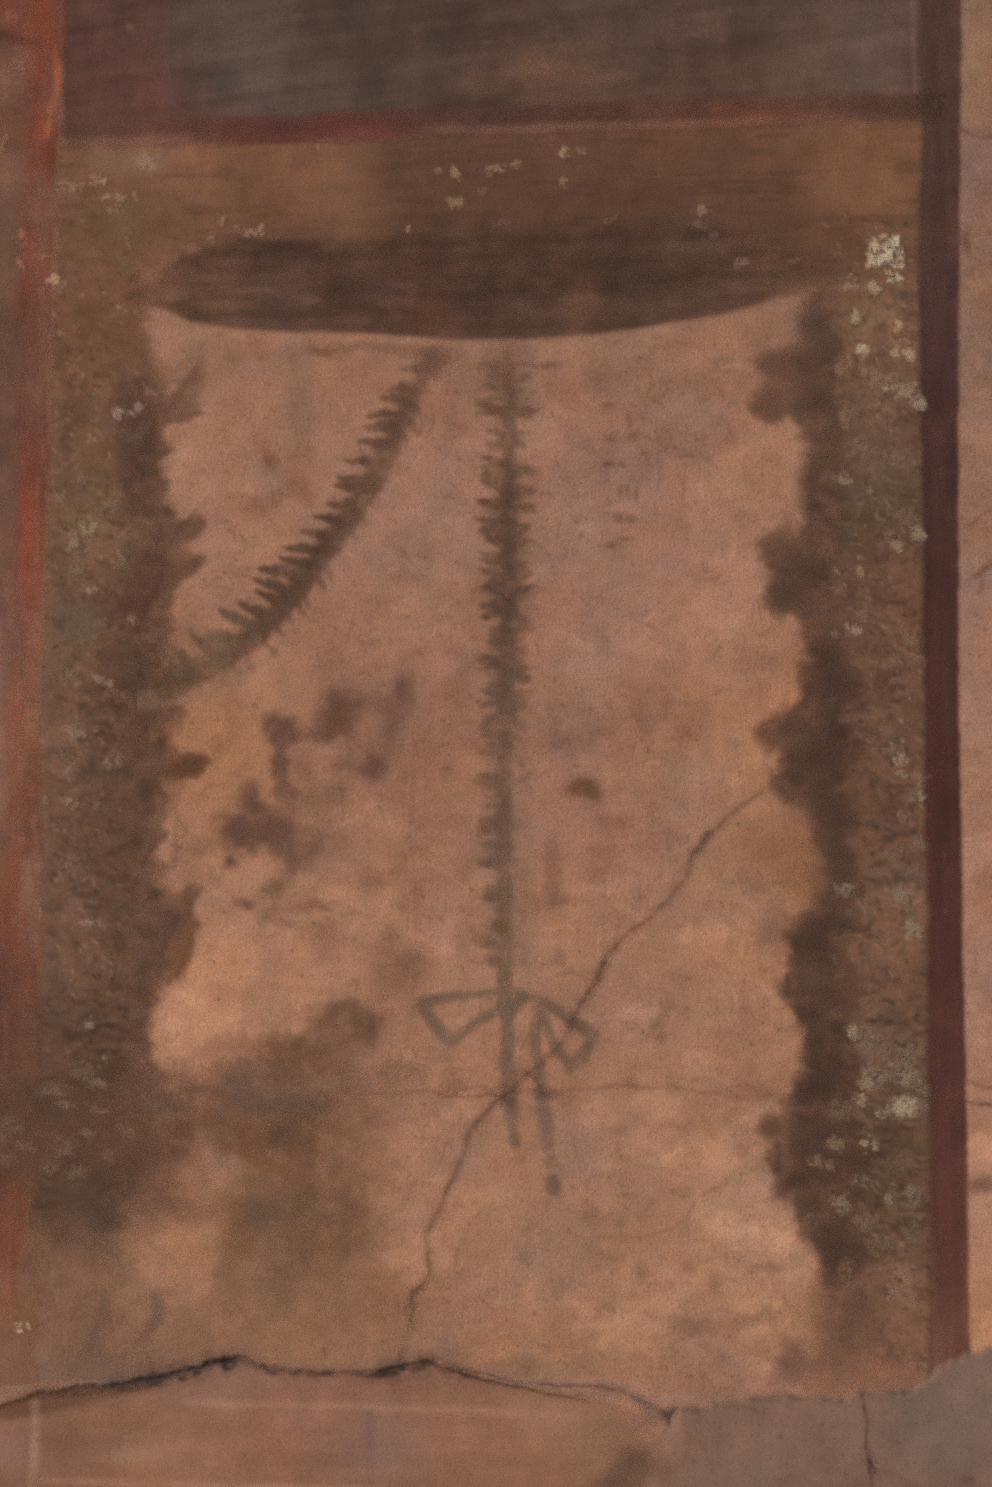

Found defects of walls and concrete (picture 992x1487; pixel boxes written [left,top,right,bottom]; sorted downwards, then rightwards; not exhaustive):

crack [18,1355,276,1401]
crack [325,1359,489,1381]
crack [660,1411,675,1421]